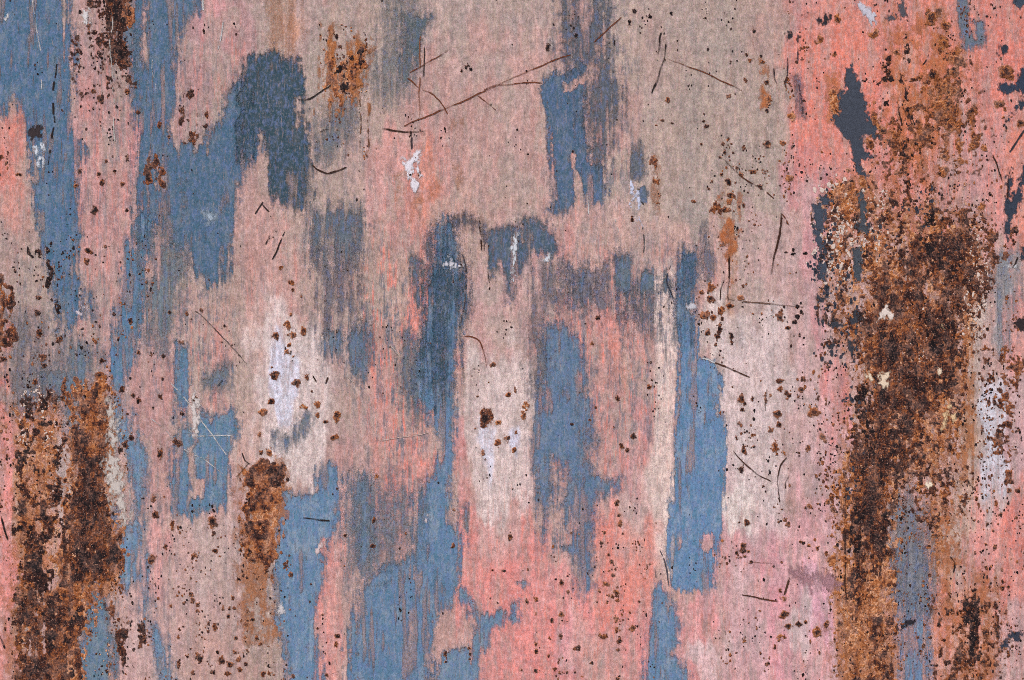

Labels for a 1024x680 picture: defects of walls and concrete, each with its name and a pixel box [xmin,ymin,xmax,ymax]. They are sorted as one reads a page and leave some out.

rust [69,0,137,122]
rust [318,24,372,157]
rust [732,2,1024,680]
rust [0,234,155,680]
rust [148,447,293,678]
rust [714,543,753,572]